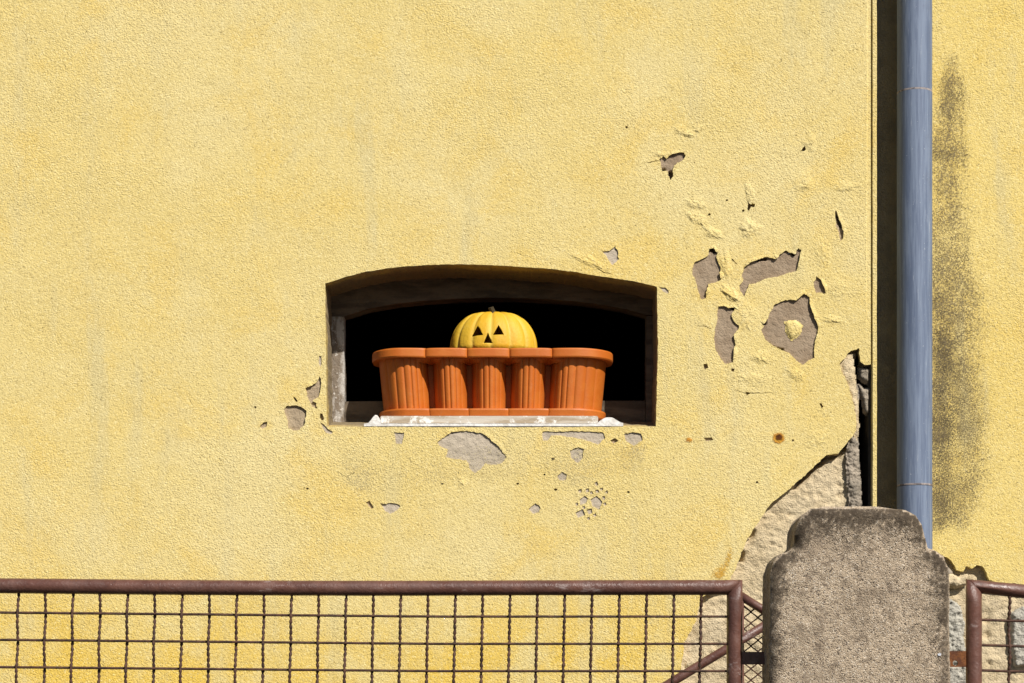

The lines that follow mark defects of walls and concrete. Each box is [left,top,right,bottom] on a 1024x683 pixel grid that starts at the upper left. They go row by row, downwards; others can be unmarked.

peeling [660,150,685,180]
peeling [692,245,724,299]
peeling [714,249,805,372]
peeling [760,276,828,365]
peeling [284,356,333,434]
crack [854,353,870,416]
water stain [772,57,990,683]
peeling [437,428,506,473]
peeling [542,428,645,463]
flaking render [731,350,868,652]
flaking render [680,595,727,683]
flaking render [744,665,762,683]